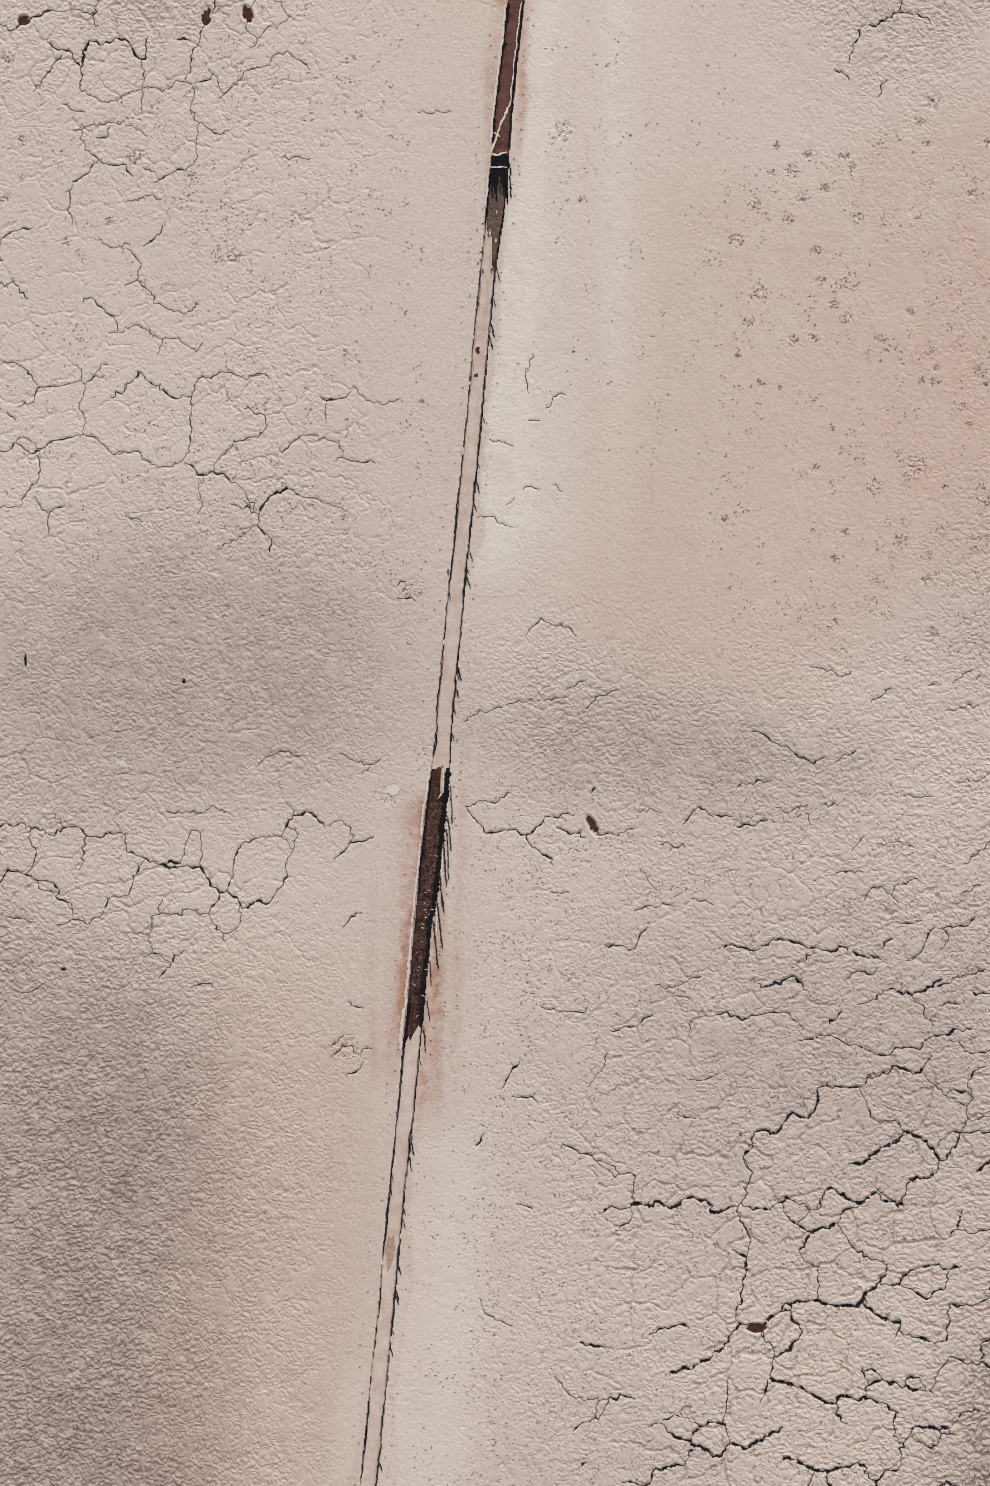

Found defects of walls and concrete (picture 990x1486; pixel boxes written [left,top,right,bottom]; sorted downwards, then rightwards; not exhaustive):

rust [479,0,545,222]
crack [0,0,401,553]
crack [0,802,374,988]
crack [465,779,839,950]
crack [752,731,856,764]
crack [904,773,989,798]
rust [362,752,503,1273]
crack [501,1061,538,1103]